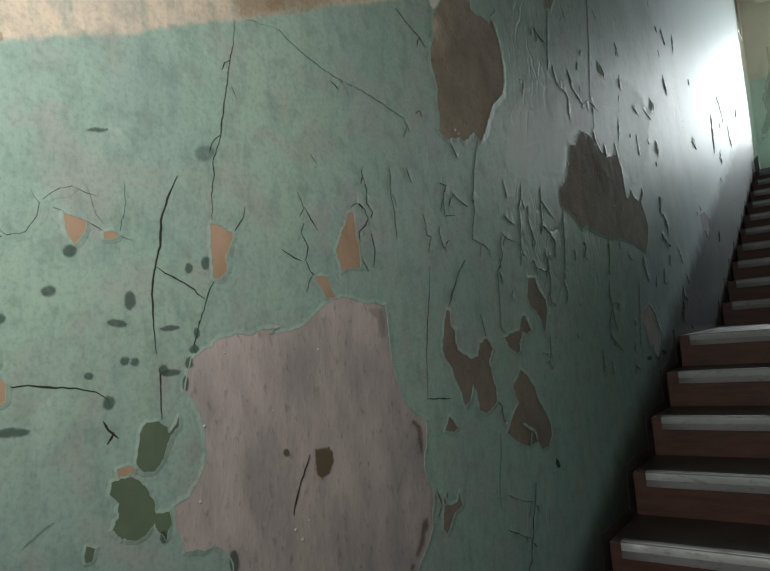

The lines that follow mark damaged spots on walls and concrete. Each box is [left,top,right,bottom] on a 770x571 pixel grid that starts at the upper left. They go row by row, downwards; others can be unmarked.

crack [210,17,423,220]
peeling [428,0,507,158]
crack [9,385,106,398]
crack [151,175,218,417]
peeling [206,207,249,284]
peeling [106,273,465,571]
crack [282,190,319,294]
peeling [333,166,383,275]
peeling [440,258,554,452]
peeling [558,128,649,255]
peeling [80,543,100,567]